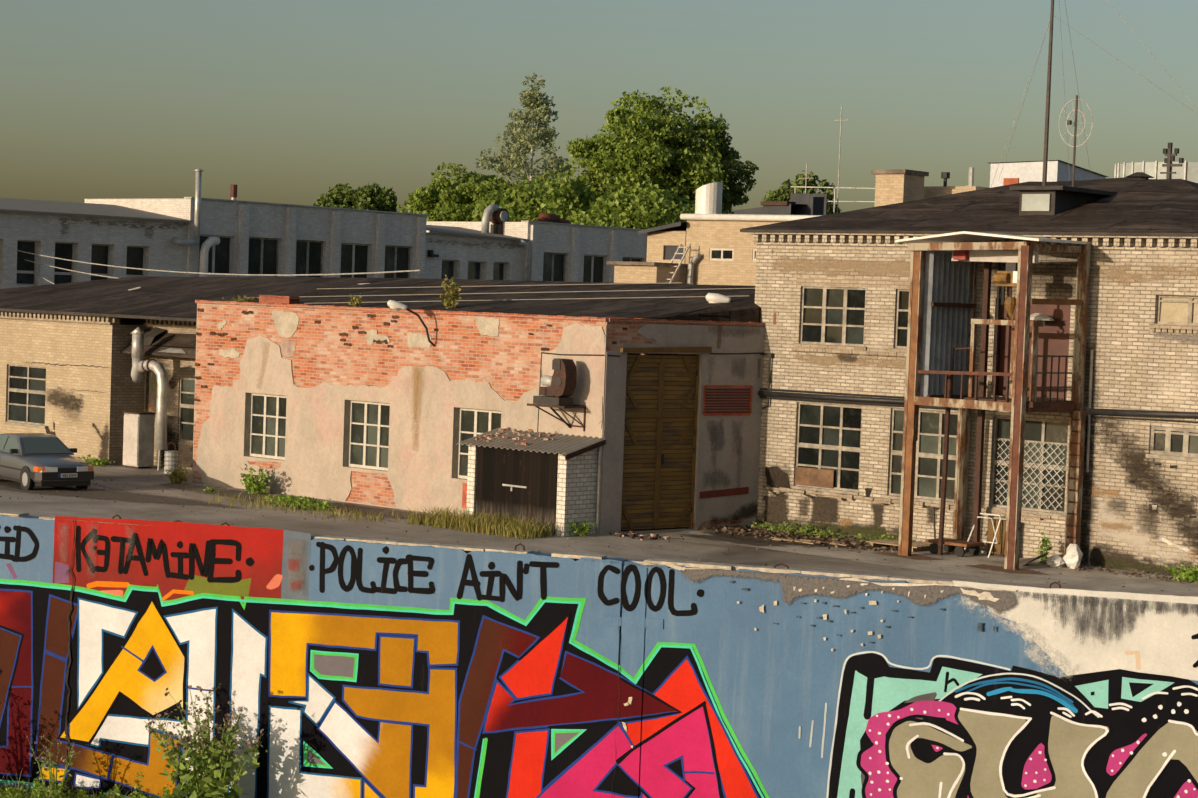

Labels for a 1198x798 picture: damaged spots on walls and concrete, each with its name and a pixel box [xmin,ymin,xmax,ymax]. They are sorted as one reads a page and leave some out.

peeling [193,305,654,484]
peeling [346,471,396,507]
water stain [1080,418,1198,576]
spalling [632,561,1073,675]
water stain [1018,591,1198,644]